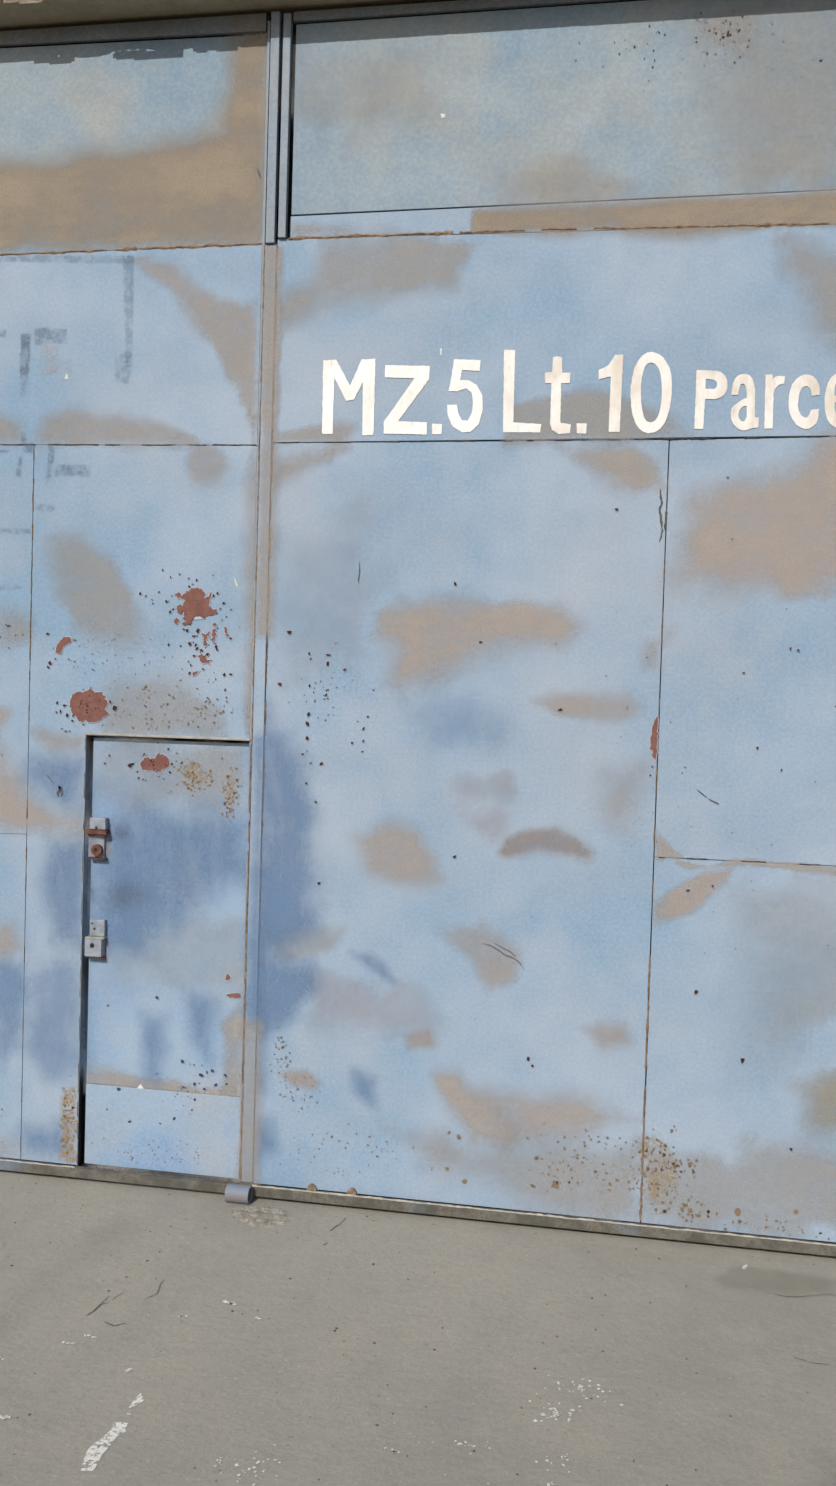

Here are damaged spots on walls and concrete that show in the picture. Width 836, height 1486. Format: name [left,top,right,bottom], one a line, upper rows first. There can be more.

corrosion [59,1075,79,1162]
corrosion [526,1123,830,1240]